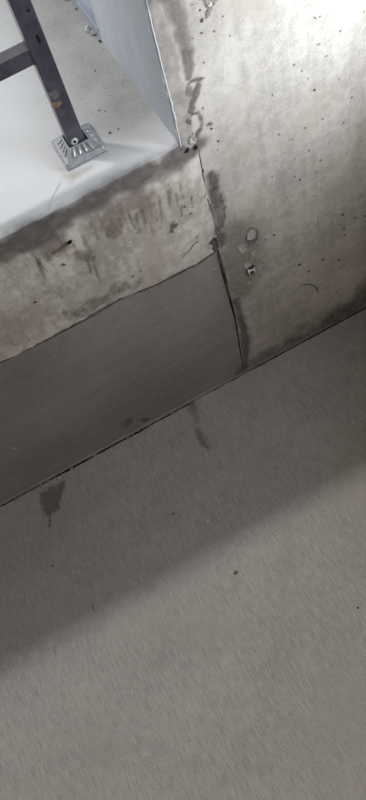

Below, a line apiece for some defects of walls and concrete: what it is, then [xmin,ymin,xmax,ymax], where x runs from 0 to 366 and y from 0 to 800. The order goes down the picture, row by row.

crack [0,152,366,511]
water stain [207,171,257,369]